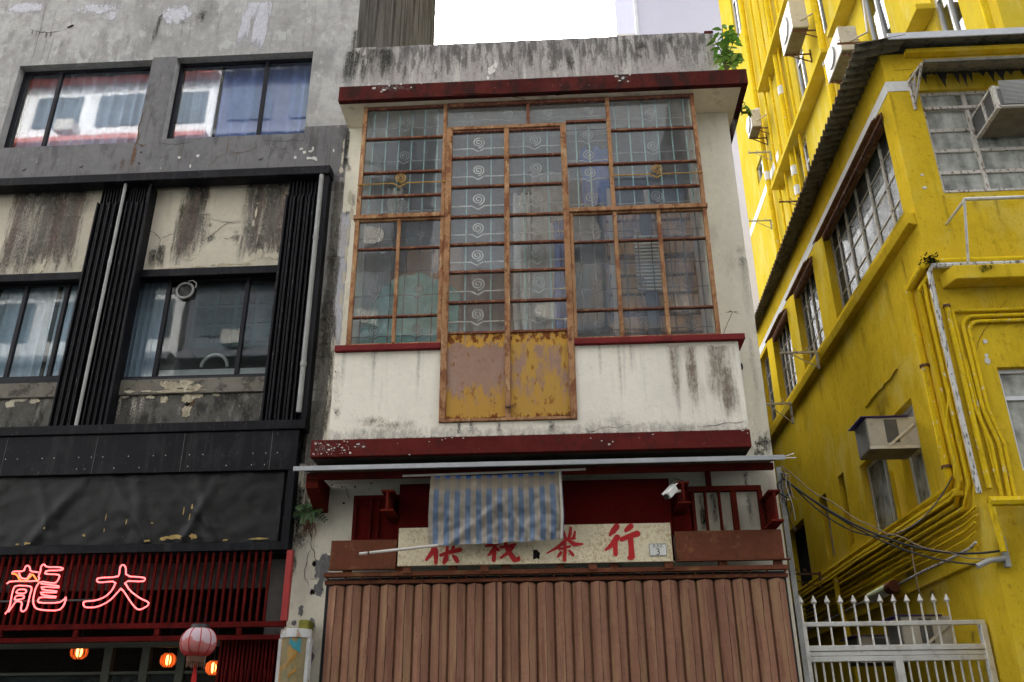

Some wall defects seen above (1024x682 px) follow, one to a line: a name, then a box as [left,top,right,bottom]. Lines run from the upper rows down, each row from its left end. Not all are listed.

peeling [159,5,194,26]
peeling [237,1,272,46]
leakage [343,31,391,77]
leakage [0,191,86,272]
leakage [148,186,214,264]
leakage [234,183,288,255]
spalling [121,380,220,418]
leakage [292,181,355,571]
leakage [687,346,697,392]
leakage [709,345,733,407]
peeling [314,553,330,597]